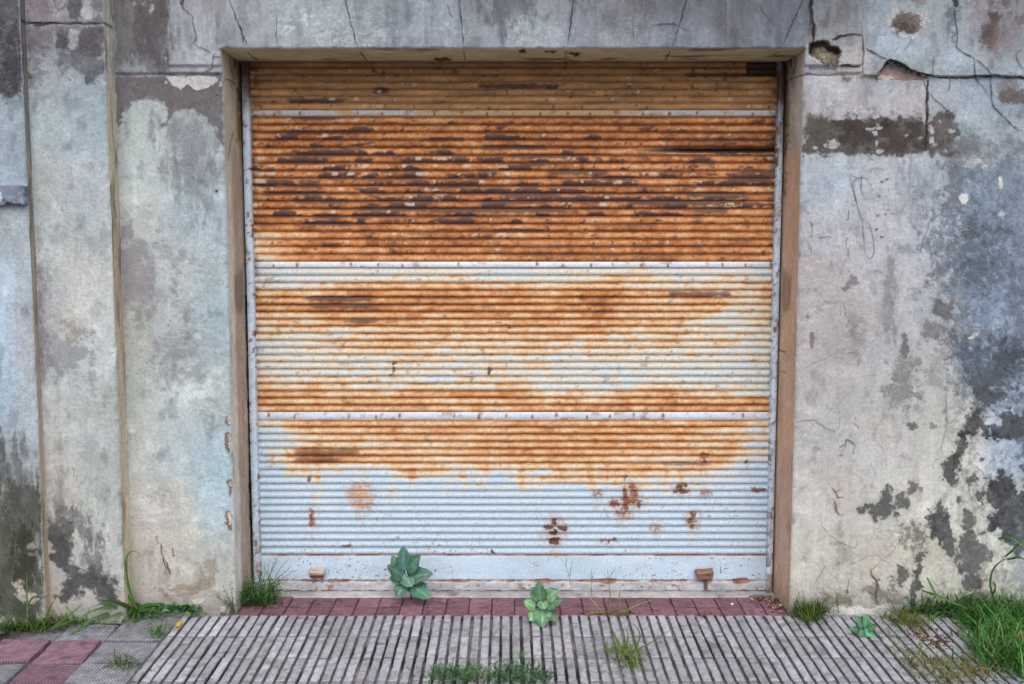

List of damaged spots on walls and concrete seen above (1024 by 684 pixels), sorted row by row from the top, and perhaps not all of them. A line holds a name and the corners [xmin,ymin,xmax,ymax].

crack [633,0,690,60]
spalling [808,40,844,66]
crack [762,0,910,82]
spalling [823,59,968,120]
crack [922,0,1024,150]
leakage [802,75,1024,607]
leakage [0,426,119,625]
corrosion [543,515,568,554]
corrosion [593,475,642,516]